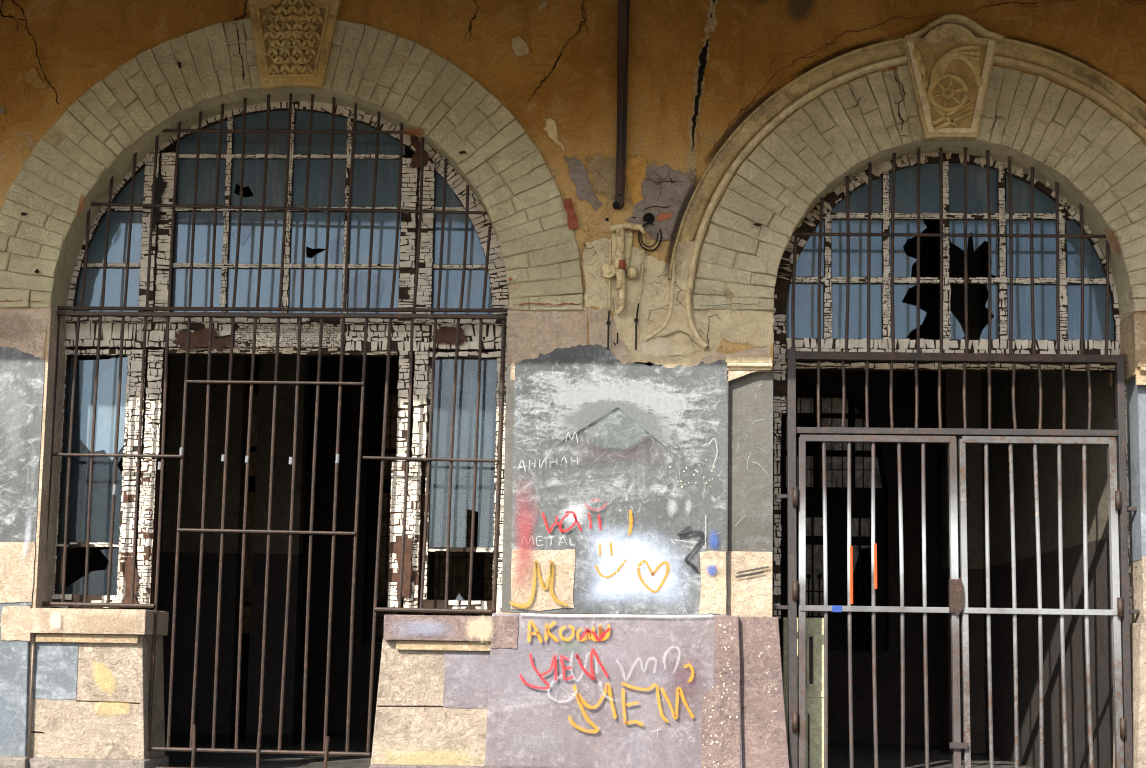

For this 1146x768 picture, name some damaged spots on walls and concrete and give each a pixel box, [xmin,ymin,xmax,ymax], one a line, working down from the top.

crack [0,0,59,104]
crack [463,0,479,43]
peeling [512,36,529,56]
crack [524,0,588,107]
crack [654,0,1092,198]
peeling [149,172,167,231]
peeling [410,135,432,168]
spalling [543,118,697,242]
peeling [169,327,236,353]
peeling [432,325,468,347]